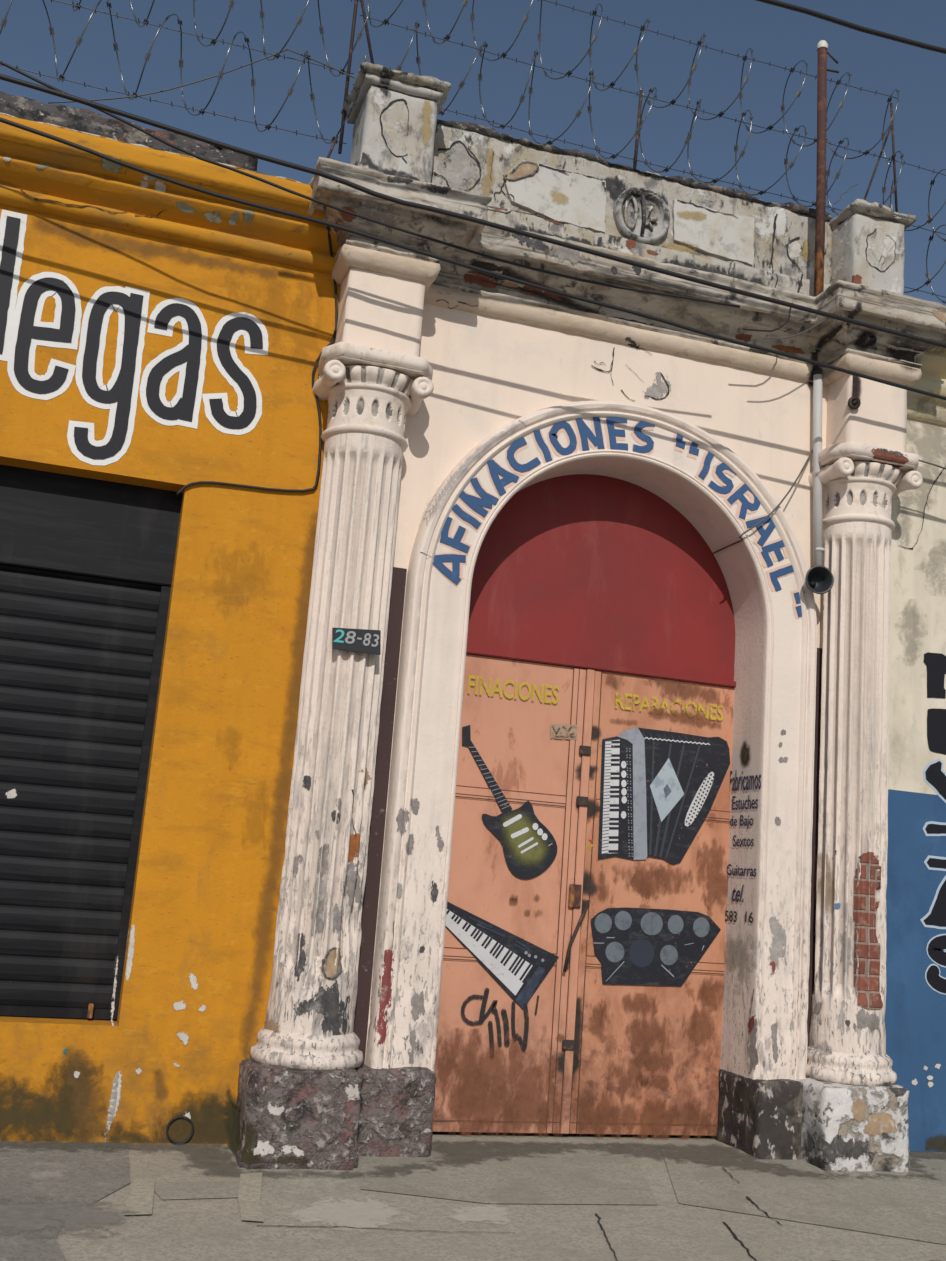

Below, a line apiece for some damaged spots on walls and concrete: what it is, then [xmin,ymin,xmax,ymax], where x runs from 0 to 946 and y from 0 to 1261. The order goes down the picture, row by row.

peeling [396,798,420,855]
peeling [104,1071,122,1142]
peeling [111,925,135,1026]
leakage [0,1062,304,1163]
peeling [293,830,362,1036]
peeling [371,921,395,1047]
peeling [408,991,425,1063]
corrosion [436,1028,562,1137]
corrosion [578,993,716,1140]
corrosion [689,981,724,1045]
peeling [801,1098,898,1163]
flaking render [834,852,883,1033]